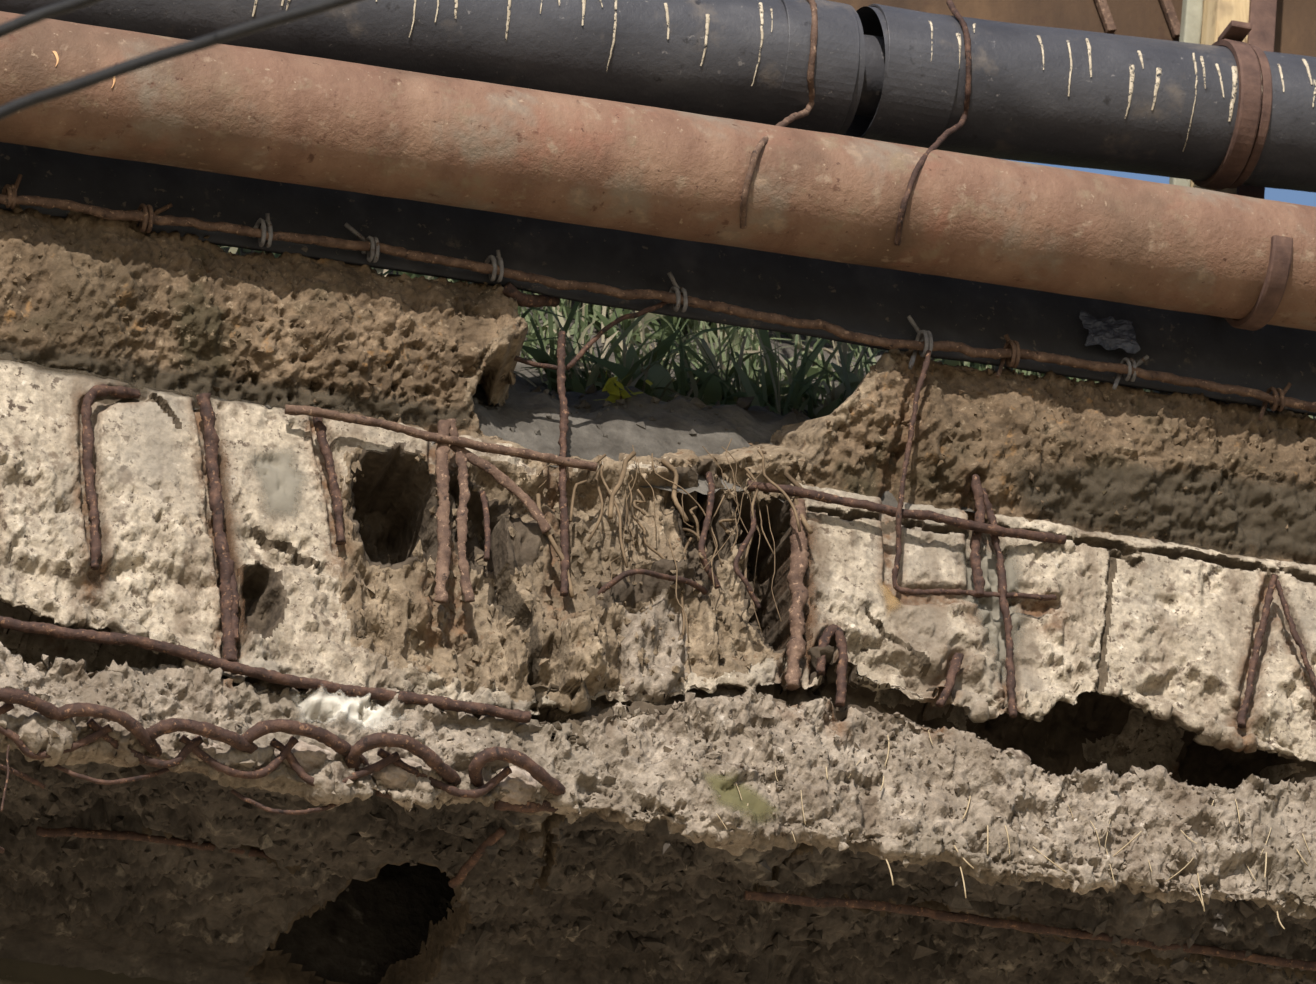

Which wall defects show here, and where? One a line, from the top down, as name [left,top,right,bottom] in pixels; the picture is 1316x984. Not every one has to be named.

corrosion [217,447,241,585]
spalling [0,174,1316,790]
crack [807,507,1316,694]
spalling [0,687,566,813]
crack [1043,702,1062,761]
spalling [36,826,275,860]